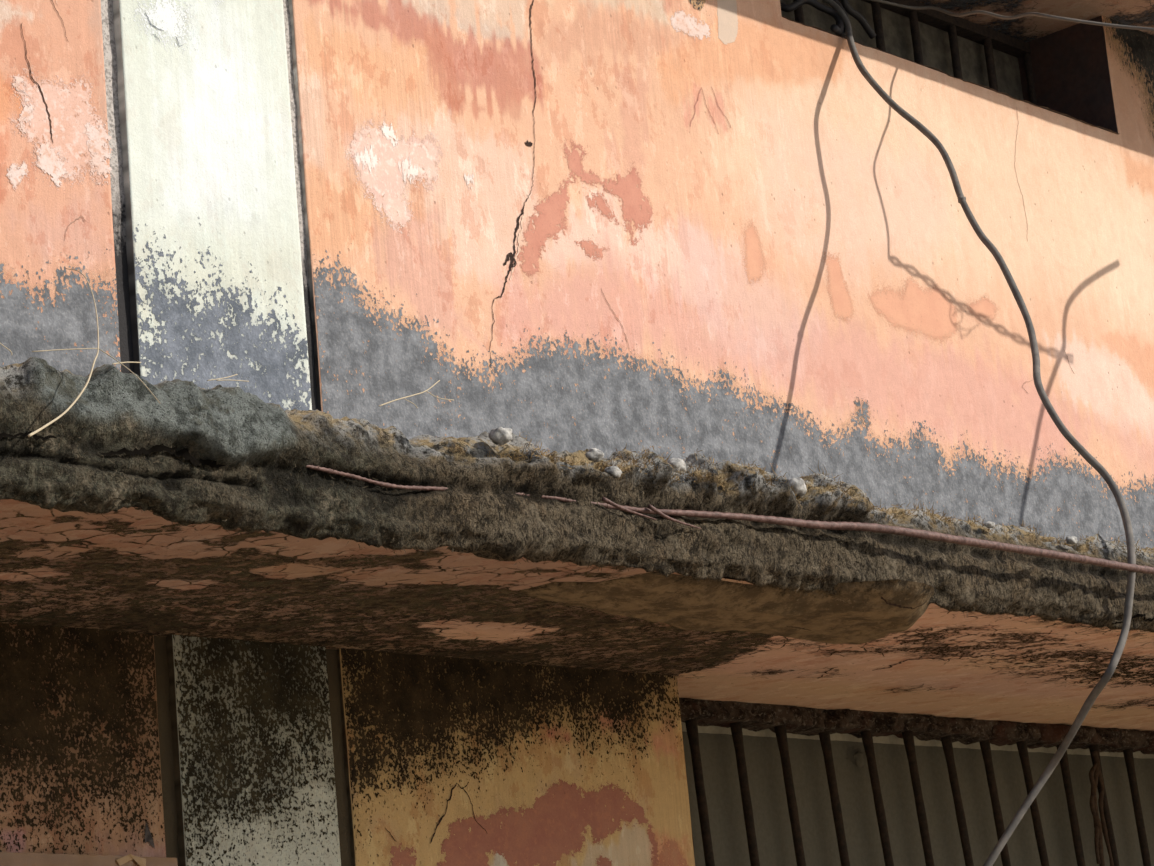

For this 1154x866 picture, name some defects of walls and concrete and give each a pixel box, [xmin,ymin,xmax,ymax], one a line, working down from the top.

crack [21,24,53,141]
peeling [6,64,112,191]
peeling [129,0,198,54]
crack [489,0,537,358]
water stain [686,0,710,16]
water stain [915,0,1049,43]
water stain [1103,0,1154,134]
water stain [0,251,121,377]
water stain [133,222,1154,549]
spalling [0,357,1154,633]
water stain [0,511,1154,866]
peeling [436,779,659,866]